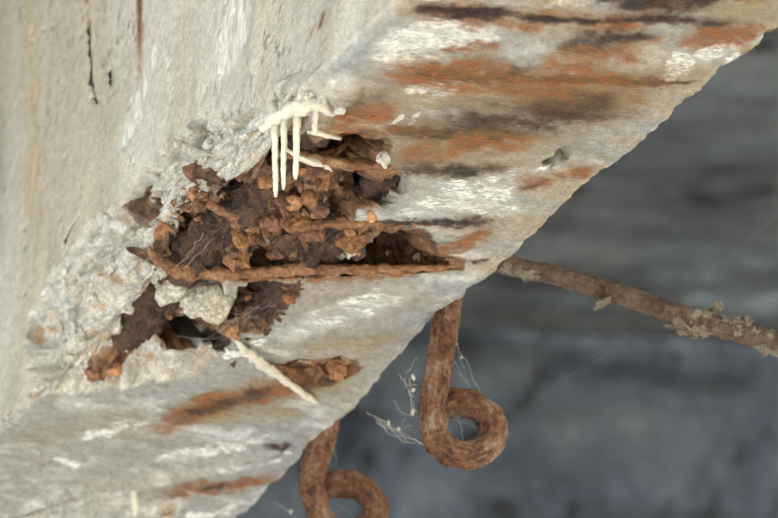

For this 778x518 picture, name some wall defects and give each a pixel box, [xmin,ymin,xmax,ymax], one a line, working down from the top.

spalling [543,0,599,8]
corrosion [326,0,764,180]
leakage [258,98,335,133]
leakage [307,130,342,140]
leakage [287,147,333,172]
corrosion [517,166,592,191]
spalling [23,81,468,399]
corrosion [375,216,494,255]
corrosion [153,380,304,433]
corrosion [167,477,269,499]